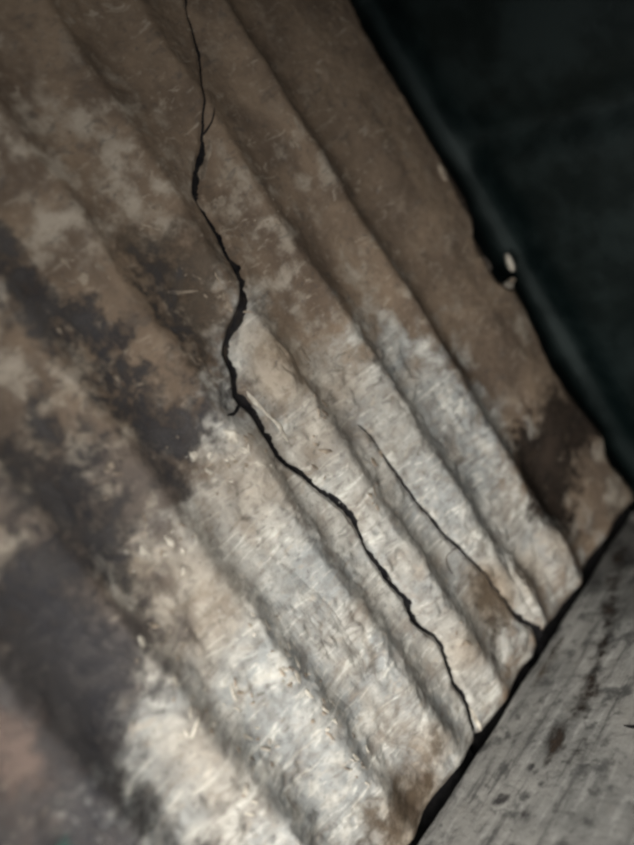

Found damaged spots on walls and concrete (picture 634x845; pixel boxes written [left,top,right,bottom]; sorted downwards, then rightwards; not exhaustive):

crack [185,0,482,738]
crack [358,425,543,641]